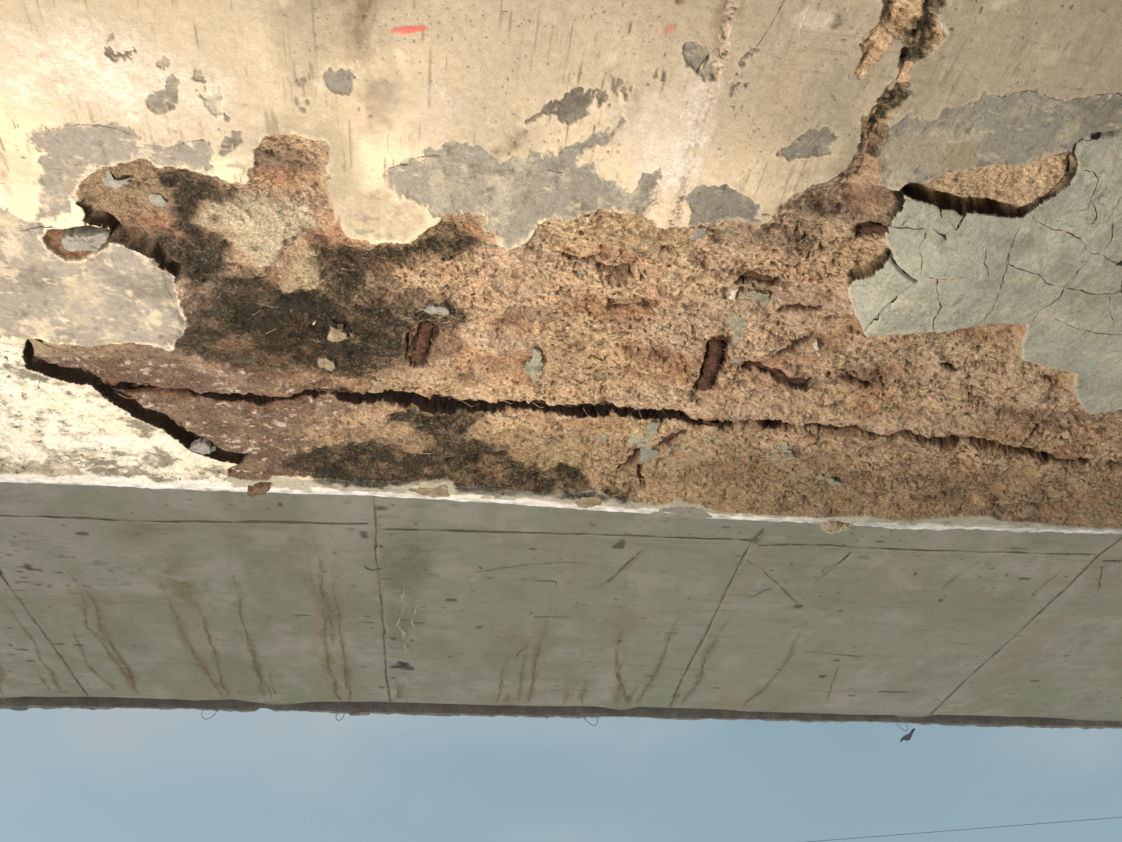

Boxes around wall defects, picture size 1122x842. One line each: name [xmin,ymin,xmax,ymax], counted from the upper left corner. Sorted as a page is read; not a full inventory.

crack [1078,132,1101,142]
damp [153,170,479,378]
spalling [0,0,1122,529]
crack [870,170,1122,335]